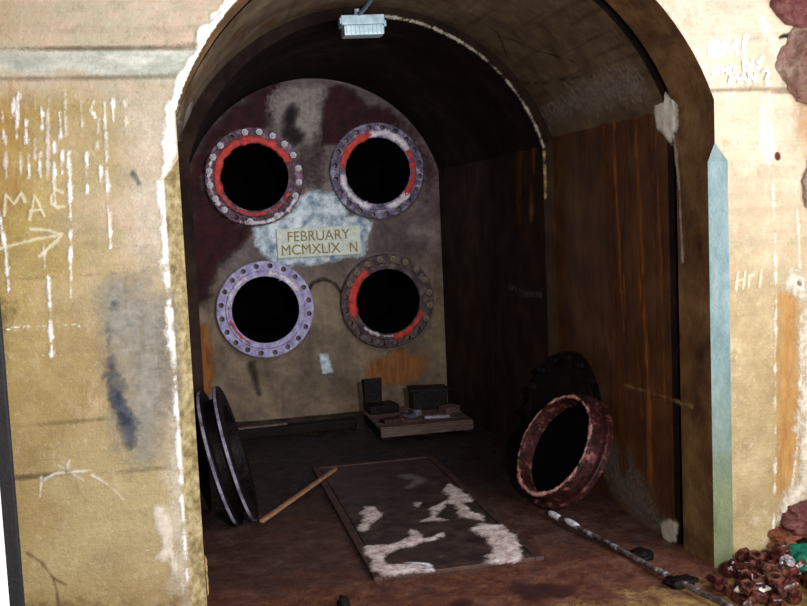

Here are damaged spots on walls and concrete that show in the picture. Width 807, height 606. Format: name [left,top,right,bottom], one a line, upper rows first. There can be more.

damp [0,217,10,292]
damp [2,92,73,220]
damp [43,247,51,308]
damp [47,320,55,357]
damp [91,98,128,192]
damp [106,281,175,460]
peeling [161,299,189,587]
peeling [134,0,237,289]
damp [190,83,435,306]
damp [759,107,775,160]
corrosion [780,295,796,488]